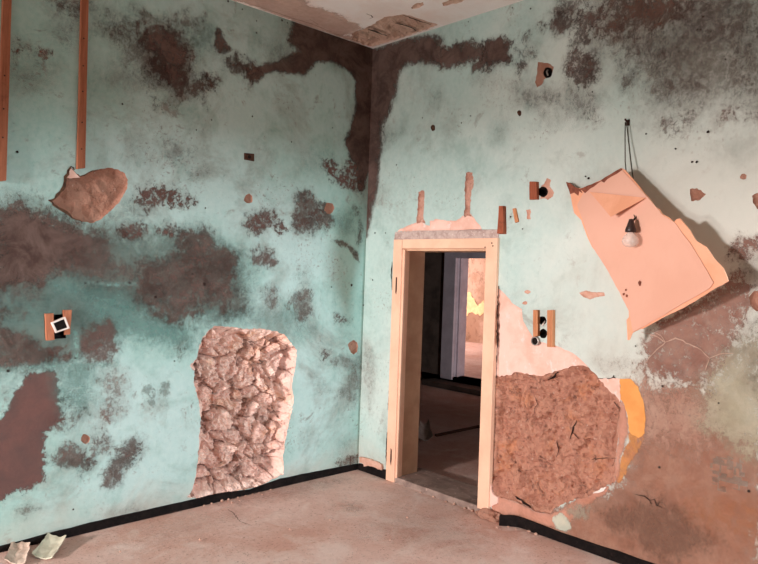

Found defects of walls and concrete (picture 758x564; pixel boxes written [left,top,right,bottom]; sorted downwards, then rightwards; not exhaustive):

peeling [351,2,438,46]
water stain [537,0,752,93]
water stain [116,0,537,261]
flaking render [397,172,482,232]
flaking render [690,188,706,201]
water stain [252,244,279,269]
water stain [0,183,247,501]
water stain [287,289,312,321]
spalling [188,326,297,498]
spalling [490,289,646,518]